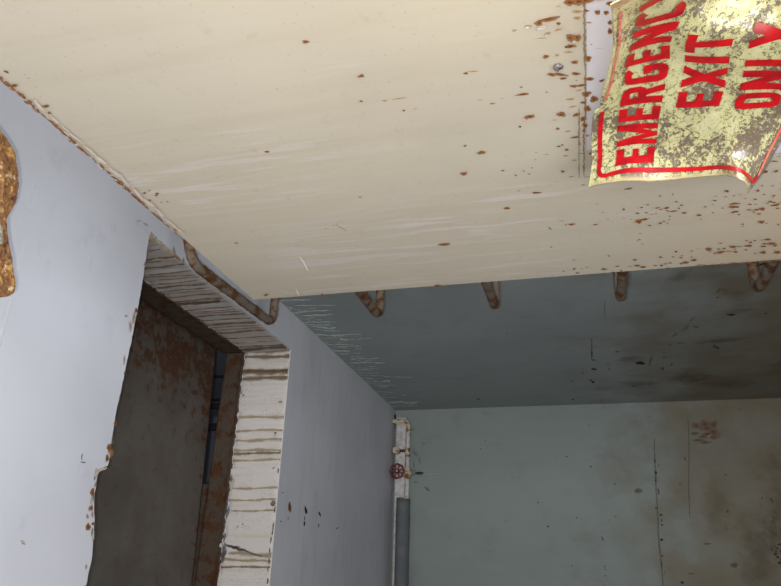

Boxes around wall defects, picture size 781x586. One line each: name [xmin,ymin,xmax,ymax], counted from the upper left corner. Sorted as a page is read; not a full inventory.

corrosion [514,0,613,138]
corrosion [0,71,198,253]
corrosion [706,239,781,265]